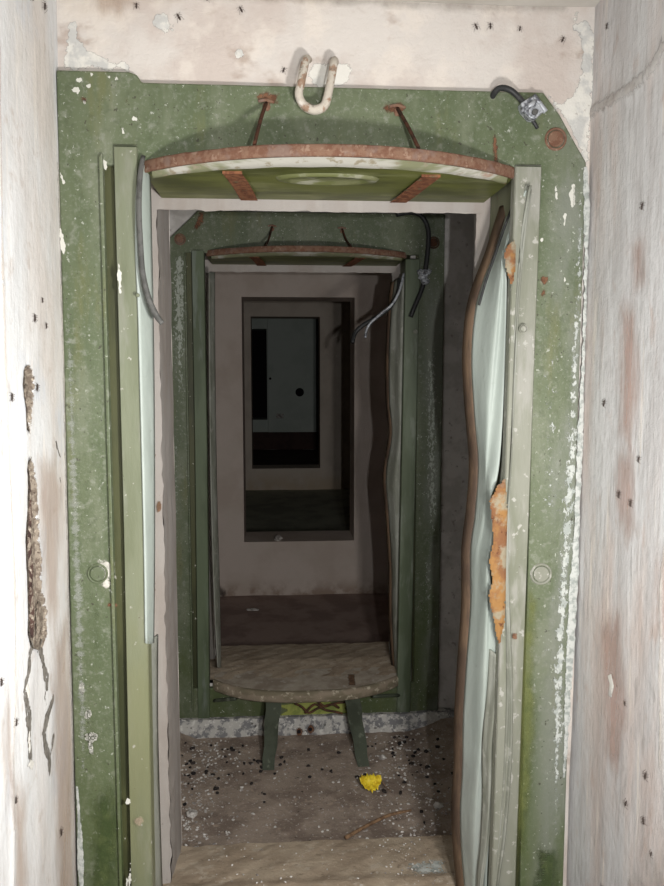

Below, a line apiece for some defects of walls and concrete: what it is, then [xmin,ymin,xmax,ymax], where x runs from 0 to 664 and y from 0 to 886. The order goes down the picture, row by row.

flaking render [64,21,129,103]
flaking render [549,12,594,162]
peeling [563,184,575,226]
crack [23,457,49,770]